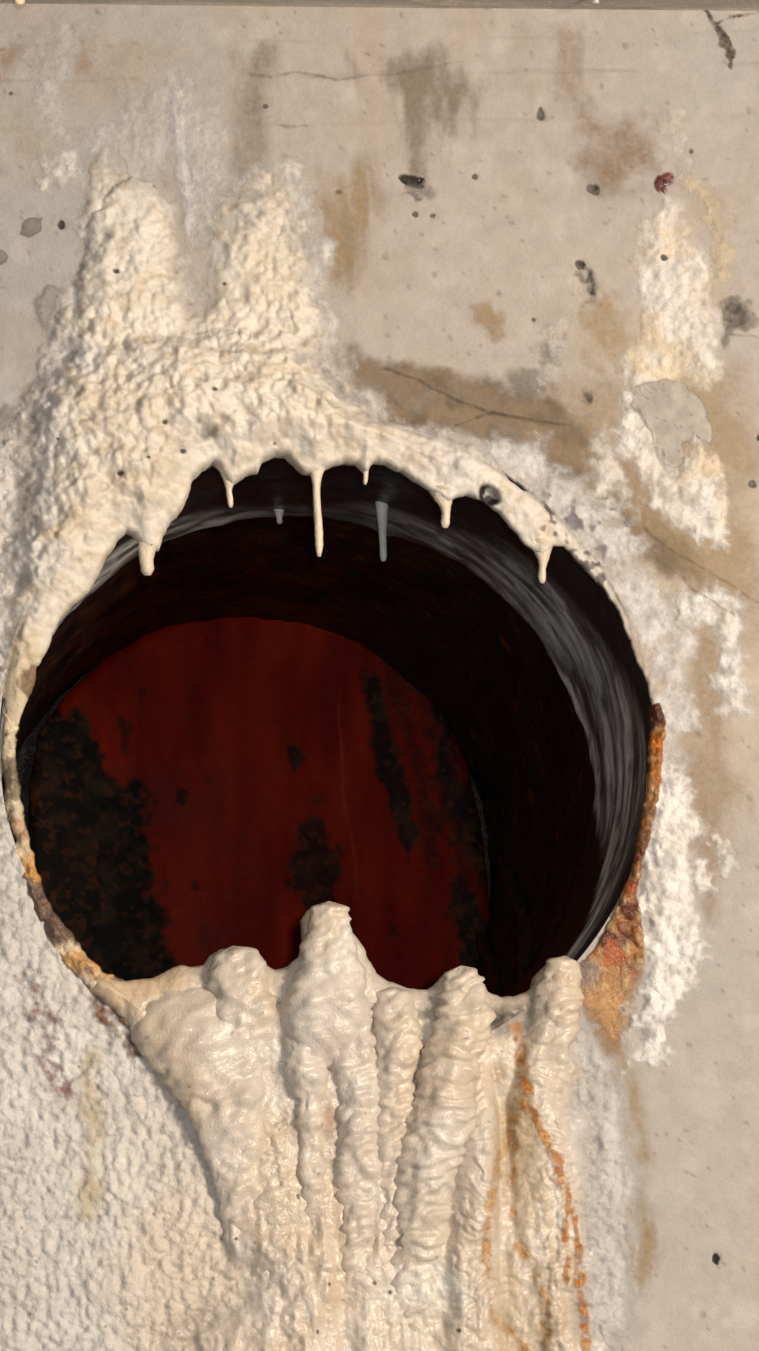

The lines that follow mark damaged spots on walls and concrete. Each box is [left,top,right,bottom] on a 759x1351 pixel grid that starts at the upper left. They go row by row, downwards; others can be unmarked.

damp [114,71,228,316]
damp [392,56,465,173]
damp [0,123,652,1351]
damp [337,175,751,1067]
rust [579,703,666,1049]
rust [482,1022,591,1351]